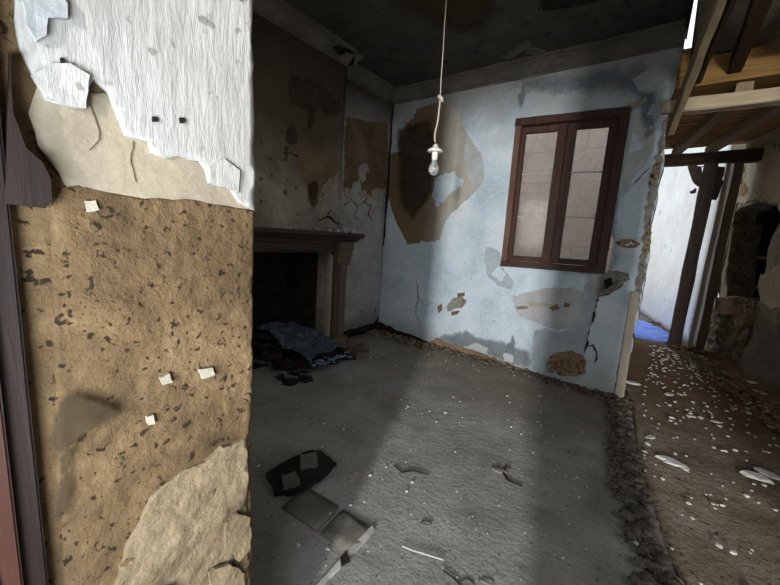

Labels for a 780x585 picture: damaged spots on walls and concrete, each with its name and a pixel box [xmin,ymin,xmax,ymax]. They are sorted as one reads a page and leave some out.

crack [318,103,394,246]
peeling [283,102,484,244]
flaking render [14,0,256,585]
peeling [429,113,669,381]
crack [583,277,623,363]
spalling [707,139,780,364]
peeling [282,452,318,491]